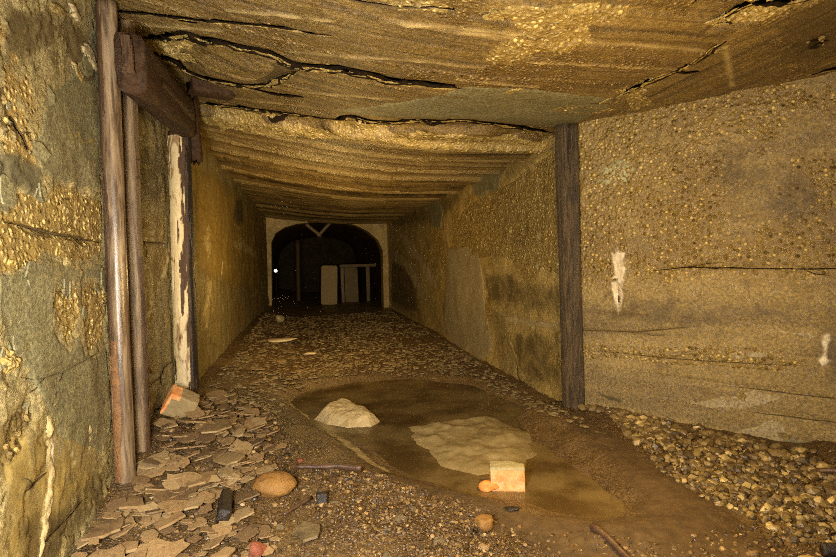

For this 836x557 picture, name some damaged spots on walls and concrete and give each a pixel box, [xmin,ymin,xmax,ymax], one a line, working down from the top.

crack [719,0,809,22]
crack [117,10,555,135]
crack [616,41,727,98]
crack [806,67,836,76]
leakage [611,248,626,312]
leakage [819,334,836,365]